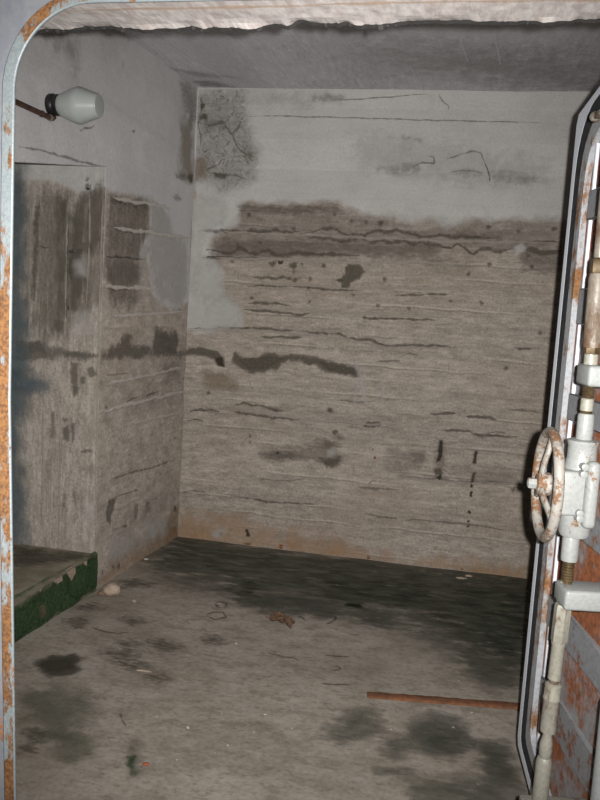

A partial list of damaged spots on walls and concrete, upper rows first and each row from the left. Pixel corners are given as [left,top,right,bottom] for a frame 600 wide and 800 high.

crack [197,90,255,188]
water stain [19,329,358,376]
water stain [434,440,443,480]
water stain [149,523,533,678]
water stain [36,654,82,676]